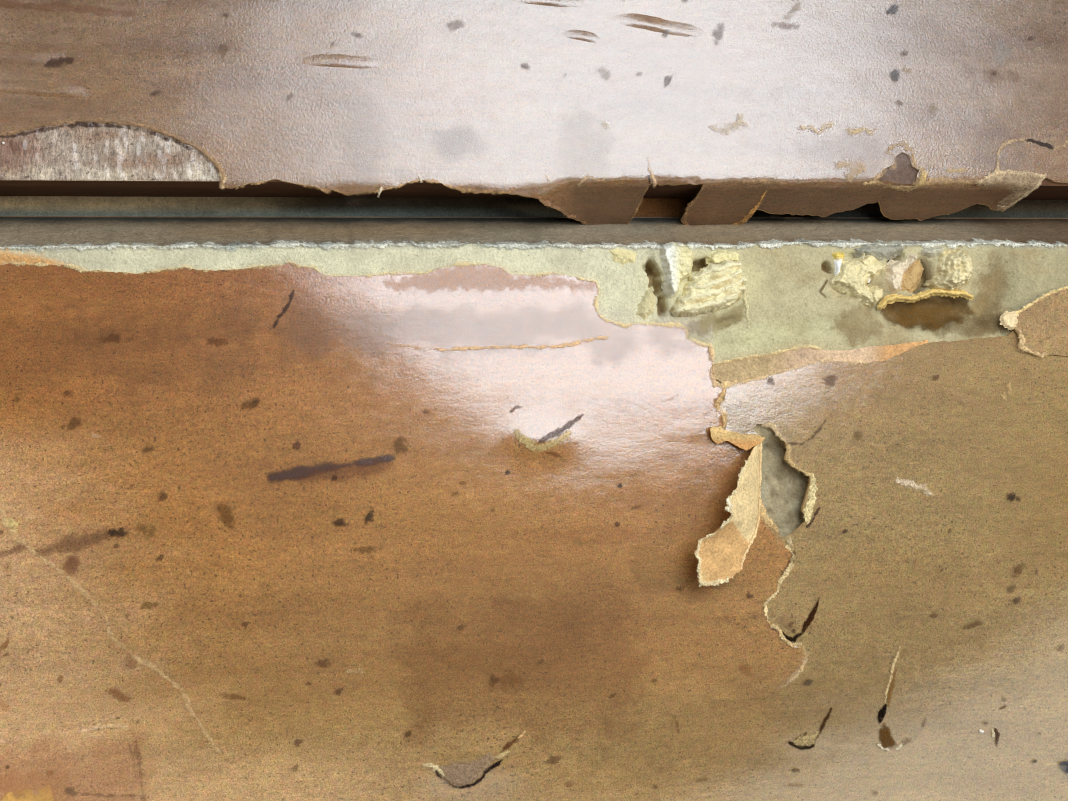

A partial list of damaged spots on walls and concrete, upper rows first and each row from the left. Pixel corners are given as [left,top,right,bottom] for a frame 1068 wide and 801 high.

peeling [0,116,226,189]
spalling [609,248,636,267]
spalling [636,242,750,334]
spalling [820,241,990,333]
peeling [694,426,765,587]
crack [770,600,819,646]
damp [0,771,53,801]